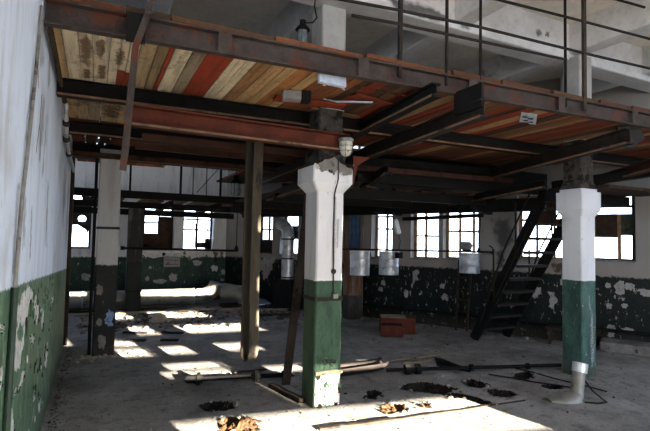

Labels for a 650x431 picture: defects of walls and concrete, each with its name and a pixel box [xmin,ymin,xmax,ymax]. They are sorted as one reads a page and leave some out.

damp [80,34,106,79]
flaking render [314,155,355,176]
peeling [145,266,177,284]
peeling [143,251,225,281]
peeling [403,270,419,298]
peeling [605,280,650,309]
peeling [12,284,45,399]
peeling [96,309,115,349]
peeling [313,359,342,409]